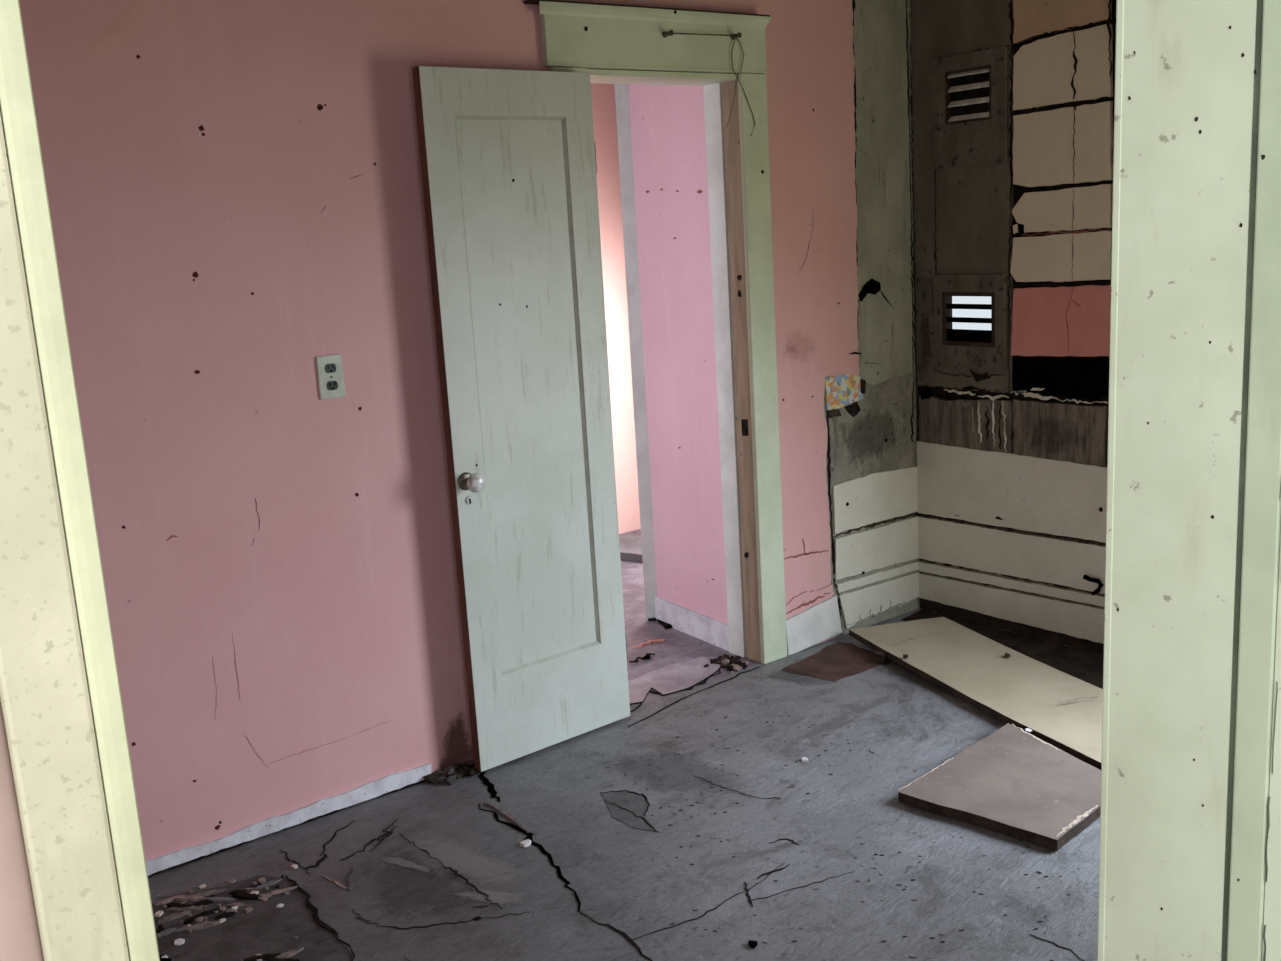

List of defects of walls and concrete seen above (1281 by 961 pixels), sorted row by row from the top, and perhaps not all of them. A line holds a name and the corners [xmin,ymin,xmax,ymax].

peeling [154,864,298,959]
peeling [242,936,304,961]
crack [479,771,854,961]